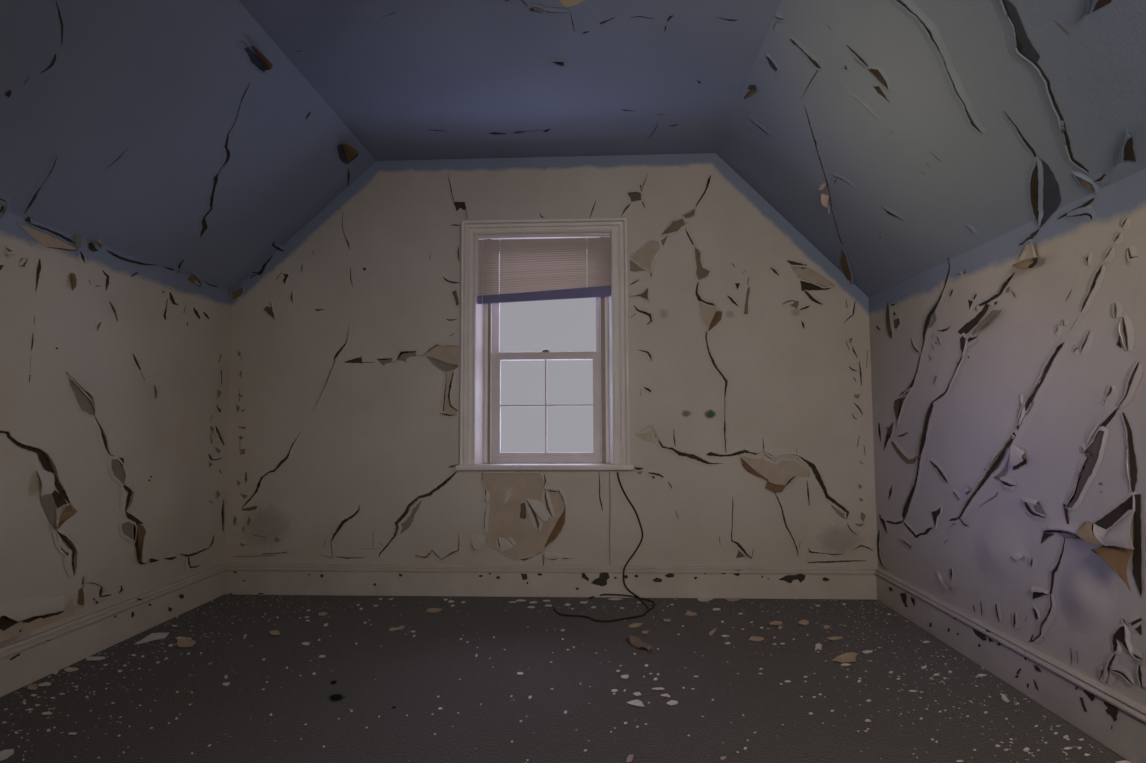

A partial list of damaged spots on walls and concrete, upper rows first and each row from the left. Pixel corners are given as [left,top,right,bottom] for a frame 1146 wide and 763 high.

crack [889,0,986,136]
crack [991,0,1089,175]
crack [29,259,41,382]
peeling [0,193,285,302]
peeling [162,291,209,326]
crack [240,324,419,511]
peeling [628,111,1146,691]
crack [893,258,952,427]
crack [1053,216,1139,356]
peeling [0,423,151,642]
crack [323,461,459,559]
peeling [479,470,568,584]